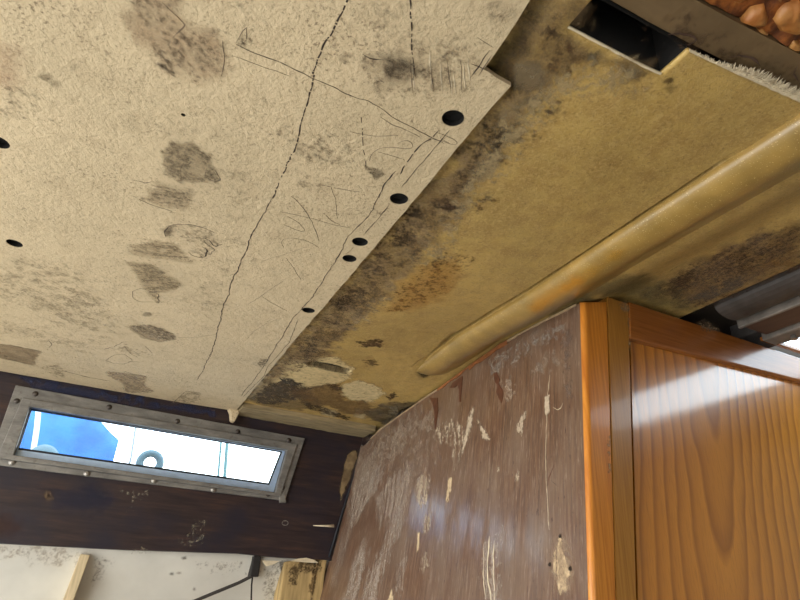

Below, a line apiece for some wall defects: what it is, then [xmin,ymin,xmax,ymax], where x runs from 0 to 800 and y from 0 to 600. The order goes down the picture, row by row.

crack [182,0,348,380]
water stain [250,67,634,424]
water stain [573,227,800,308]
peeling [246,356,386,419]
peeling [452,409,490,457]